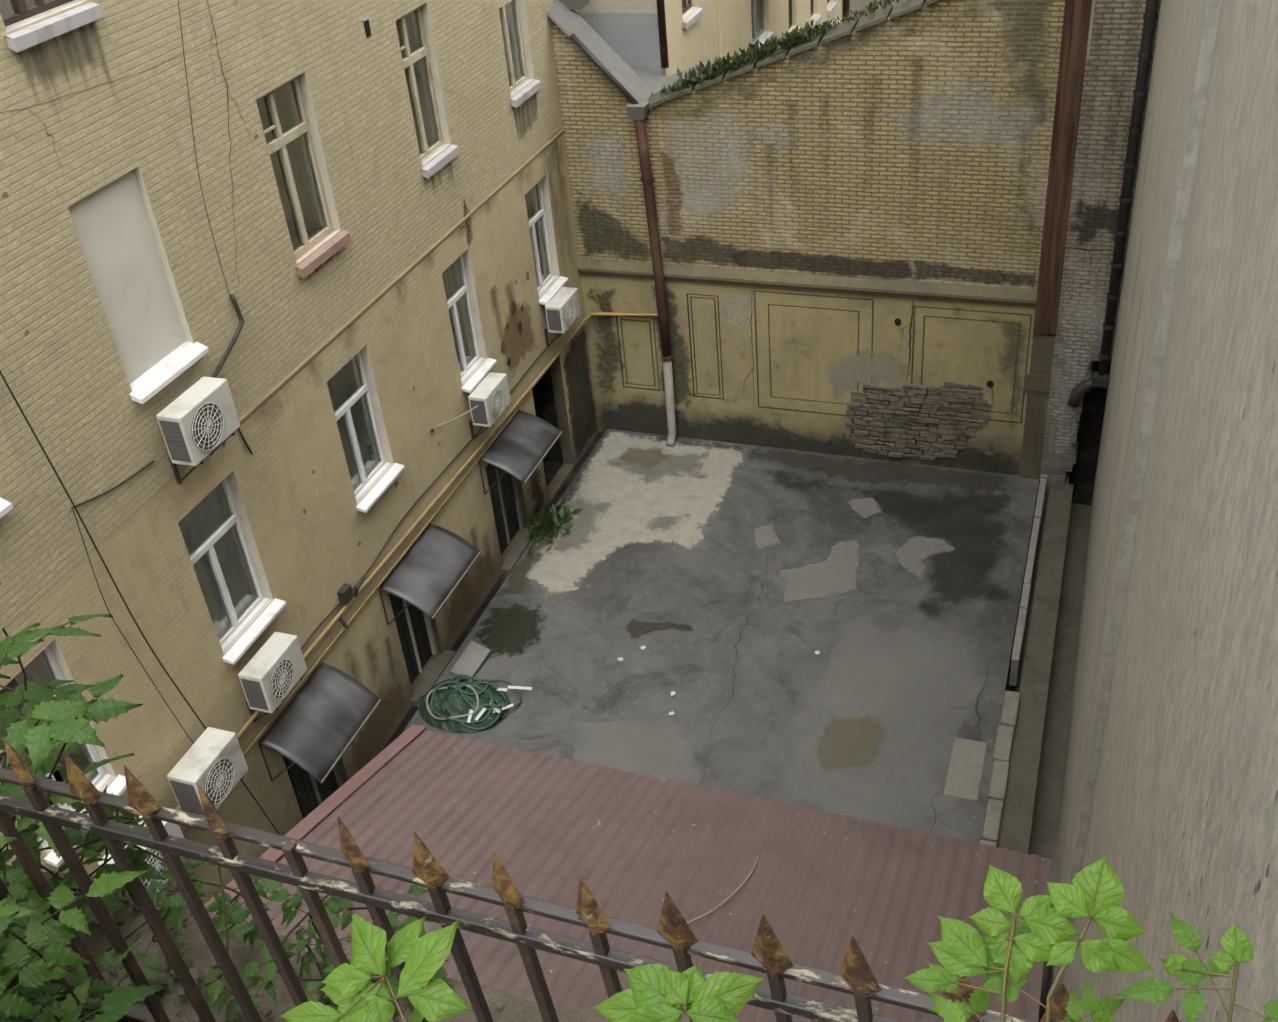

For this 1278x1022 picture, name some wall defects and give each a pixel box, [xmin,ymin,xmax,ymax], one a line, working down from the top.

crack [0,0,254,296]
water stain [450,557,492,629]
water stain [475,287,1016,657]
spalling [846,381,994,461]